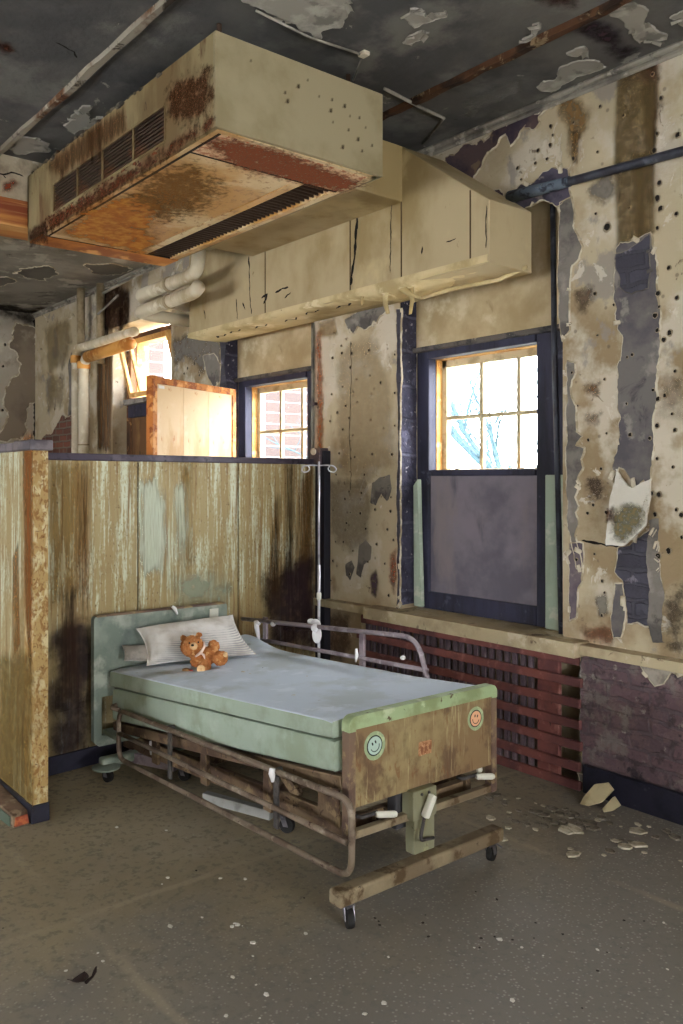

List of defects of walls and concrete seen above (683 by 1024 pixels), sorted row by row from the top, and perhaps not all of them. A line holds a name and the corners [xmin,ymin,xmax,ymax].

peeling [241,0,354,40]
peeling [400,7,448,46]
peeling [537,46,606,93]
peeling [609,2,683,47]
rust [29,65,365,254]
spalling [445,106,584,342]
peeling [0,322,42,443]
spalling [331,306,403,609]
spalling [563,226,673,643]
water stain [262,464,315,653]
water stain [48,592,91,755]
flaking render [577,656,683,793]